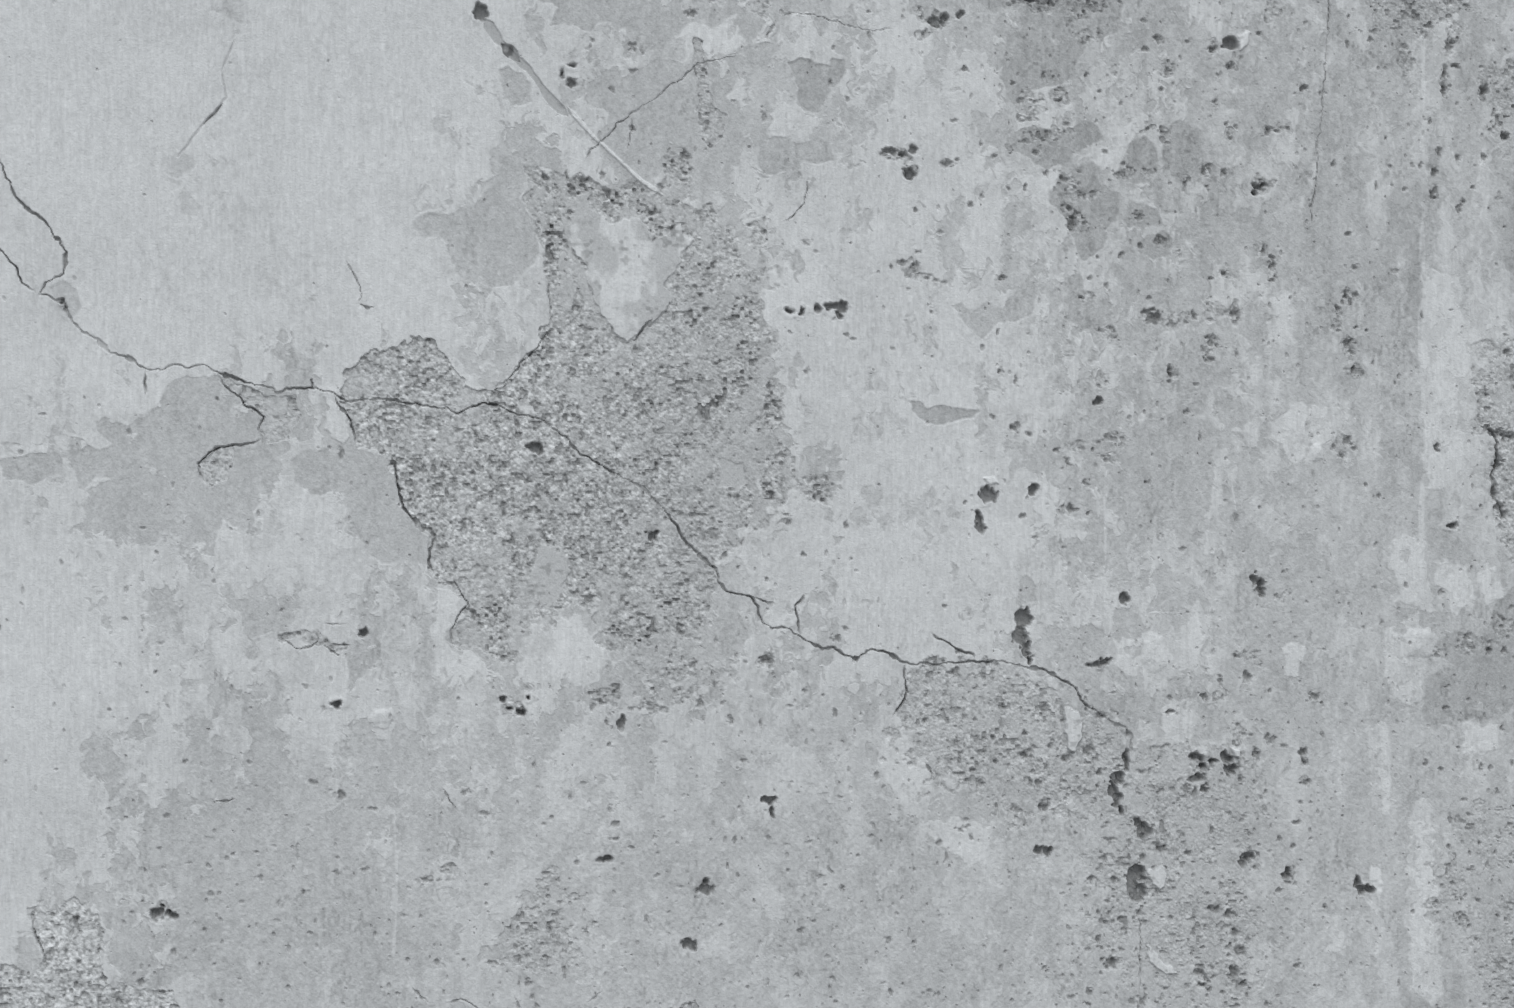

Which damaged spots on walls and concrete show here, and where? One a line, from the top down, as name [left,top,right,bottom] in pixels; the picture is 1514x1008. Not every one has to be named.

spalling [1184,0,1285,77]
crack [583,11,895,162]
spalling [889,249,948,292]
spalling [0,0,874,748]
crack [0,159,1134,771]
spalling [1330,434,1358,459]
crack [213,796,234,804]
crack [440,787,461,814]
crack [922,760,934,782]
peeling [1369,865,1384,900]
spalling [1410,759,1514,1008]
spalling [0,894,182,1008]